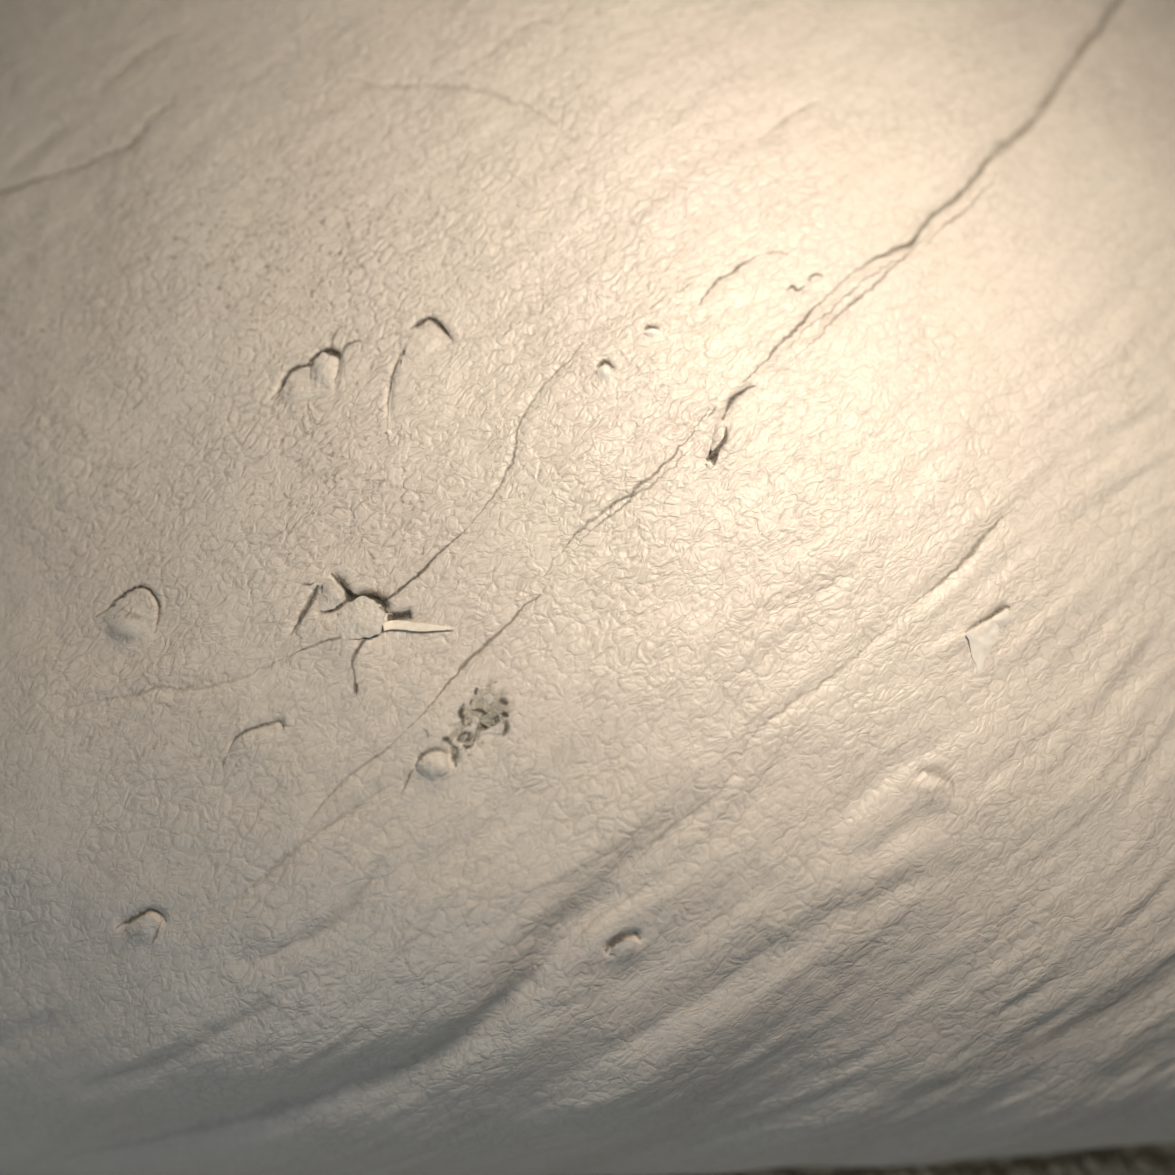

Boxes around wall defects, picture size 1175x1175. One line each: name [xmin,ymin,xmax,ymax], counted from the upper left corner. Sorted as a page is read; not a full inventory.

peeling [472,716,504,734]